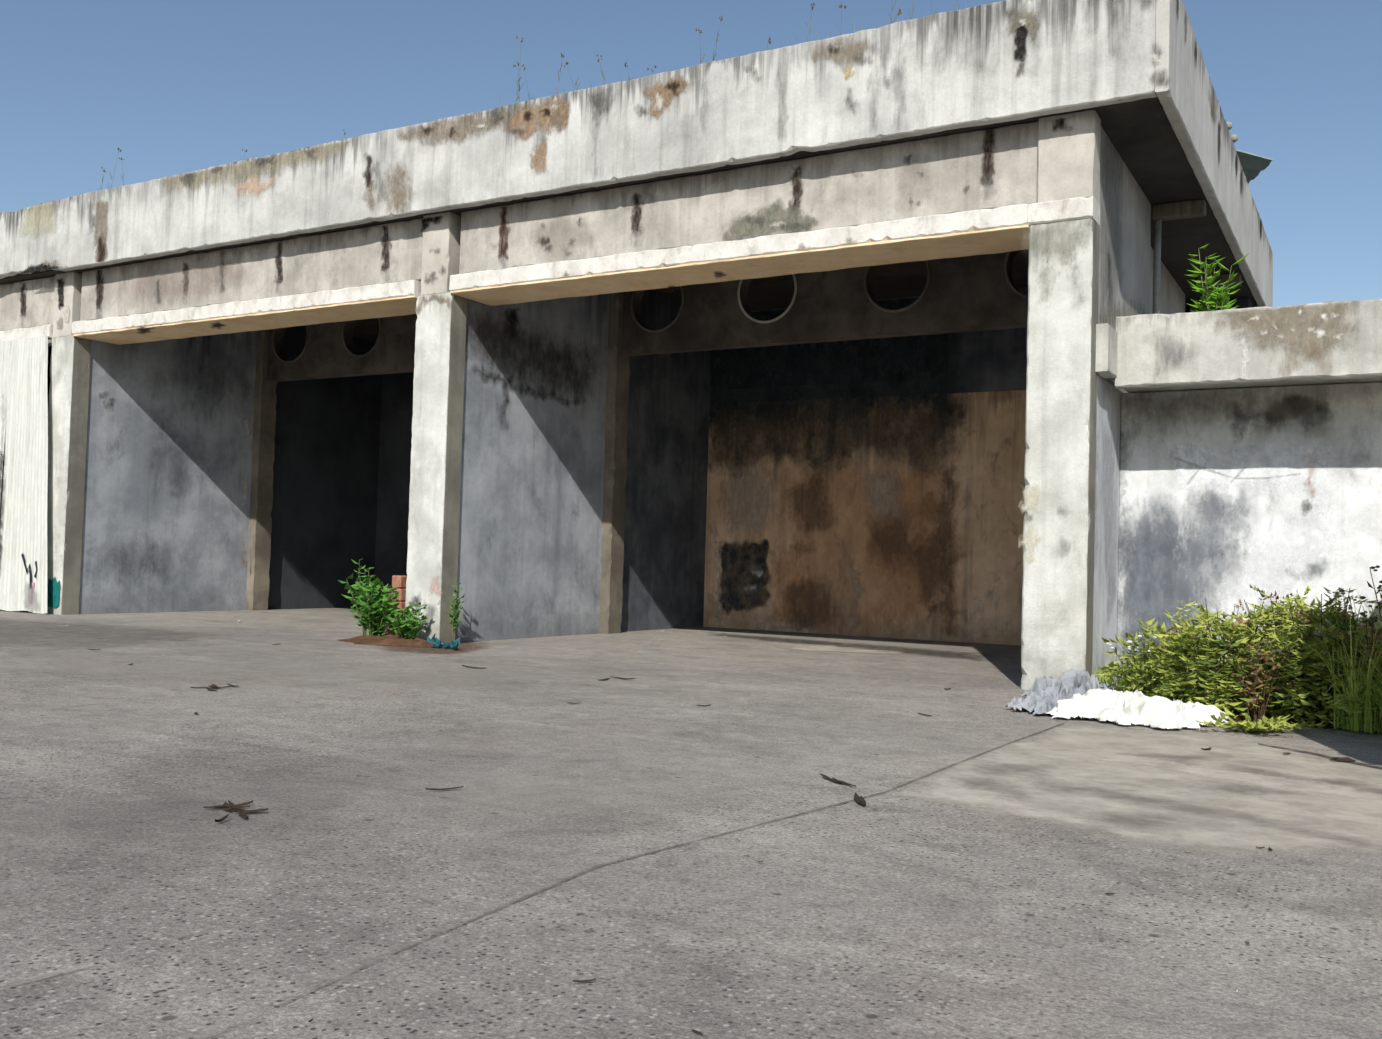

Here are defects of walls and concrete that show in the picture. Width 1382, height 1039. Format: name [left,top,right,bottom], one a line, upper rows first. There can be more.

rust [363,156,374,208]
rust [530,133,547,172]
damp [89,202,108,262]
damp [466,315,594,393]
damp [716,473,980,660]
damp [1094,393,1331,672]